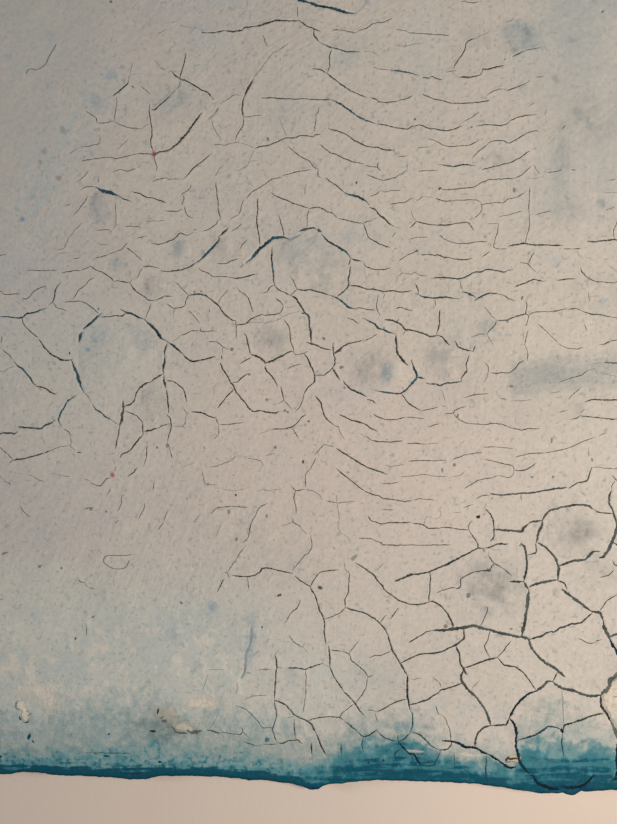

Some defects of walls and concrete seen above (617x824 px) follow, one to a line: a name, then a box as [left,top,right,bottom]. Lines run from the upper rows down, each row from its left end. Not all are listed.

crack [0,0,617,477]
crack [184,453,274,491]
crack [210,410,617,791]
peeling [153,708,219,735]
peeling [604,679,617,725]